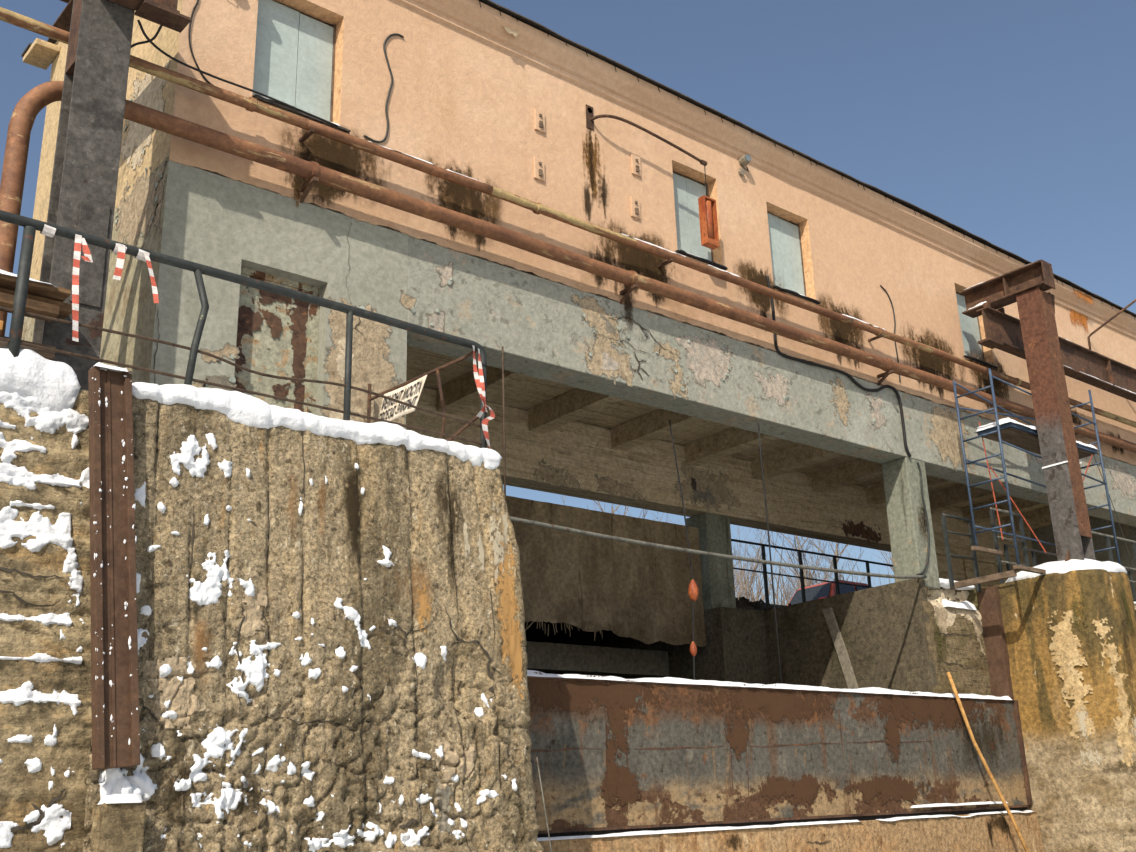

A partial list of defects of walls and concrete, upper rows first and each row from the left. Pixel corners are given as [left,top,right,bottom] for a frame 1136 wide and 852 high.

leakage [287,130,381,186]
leakage [427,160,501,224]
leakage [590,224,667,306]
peeling [320,296,405,428]
peeling [570,290,637,387]
crack [595,311,674,380]
peeling [652,333,733,400]
leakage [903,330,1009,408]
crack [236,604,268,709]
crack [379,608,501,699]
spalling [1047,610,1136,767]
corrosion [528,672,987,814]